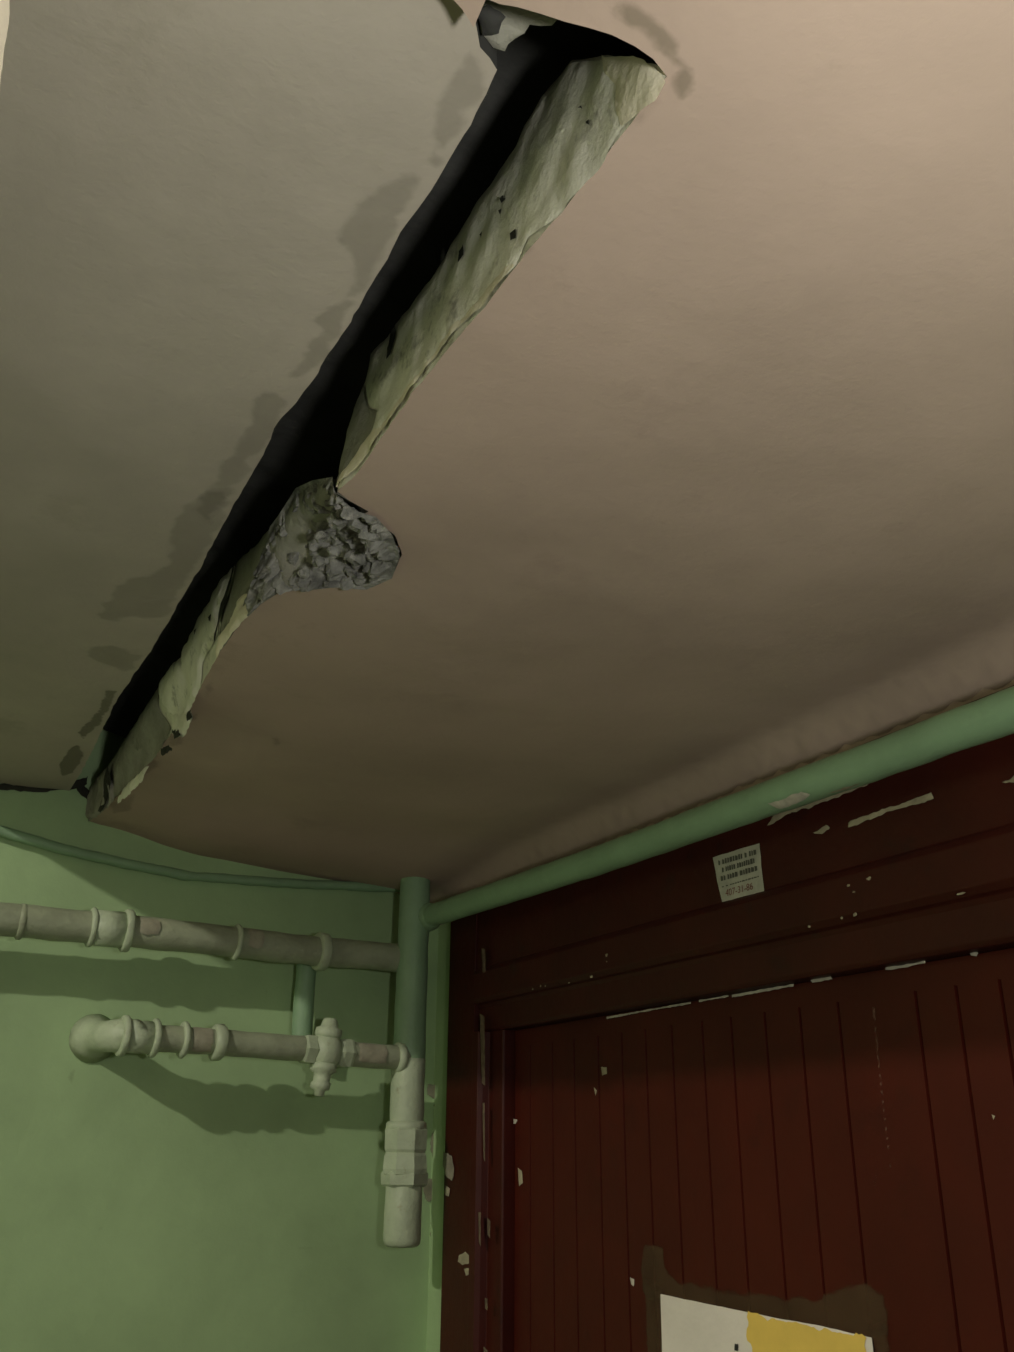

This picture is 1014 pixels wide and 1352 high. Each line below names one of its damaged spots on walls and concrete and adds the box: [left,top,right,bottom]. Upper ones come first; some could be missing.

peeling [85,54,665,819]
crack [103,0,654,738]